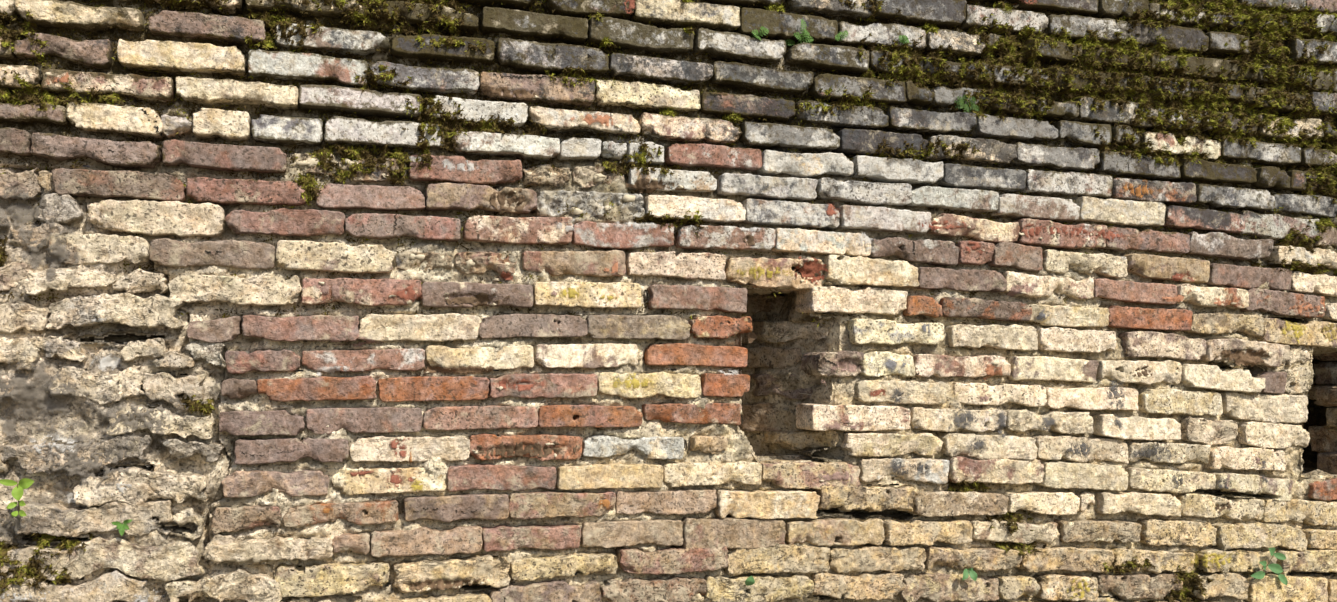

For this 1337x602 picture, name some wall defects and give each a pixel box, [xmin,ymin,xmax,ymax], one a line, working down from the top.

leakage [1104,24,1173,48]